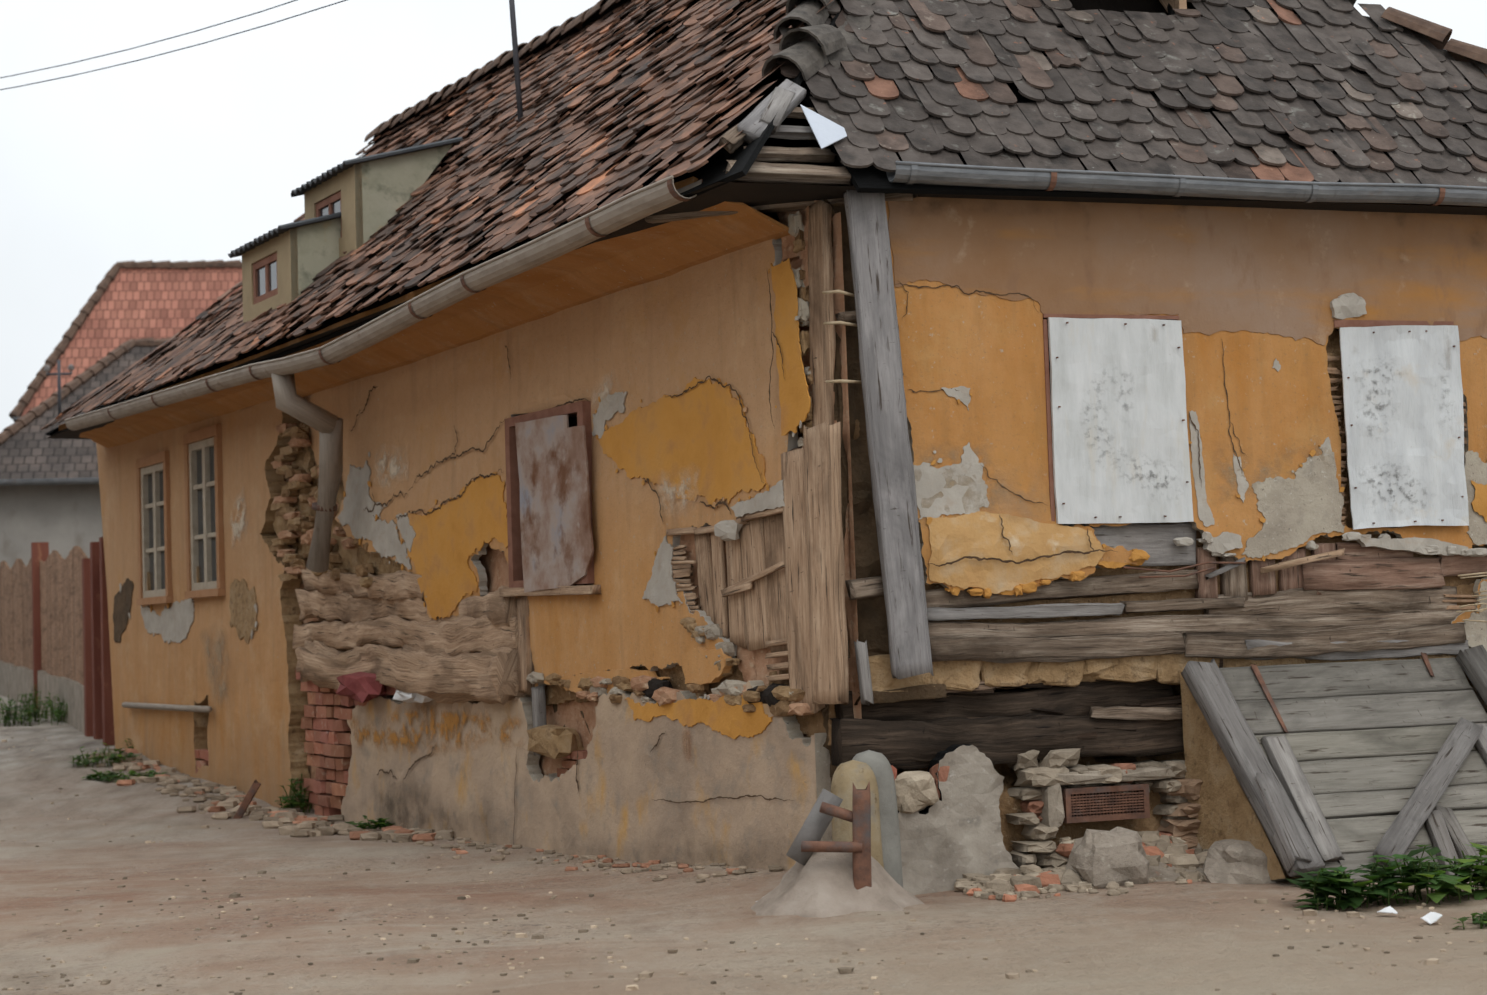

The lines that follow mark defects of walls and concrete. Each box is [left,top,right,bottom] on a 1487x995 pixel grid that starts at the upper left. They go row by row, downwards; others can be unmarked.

crack [1189,342,1248,483]
peeling [270,423,508,620]
crack [363,422,504,519]
peeling [913,442,989,526]
flaking render [925,353,1487,651]
peeling [229,579,258,644]
flaking render [353,377,838,777]
flaking render [946,681,1052,694]
flaking render [1125,695,1182,707]